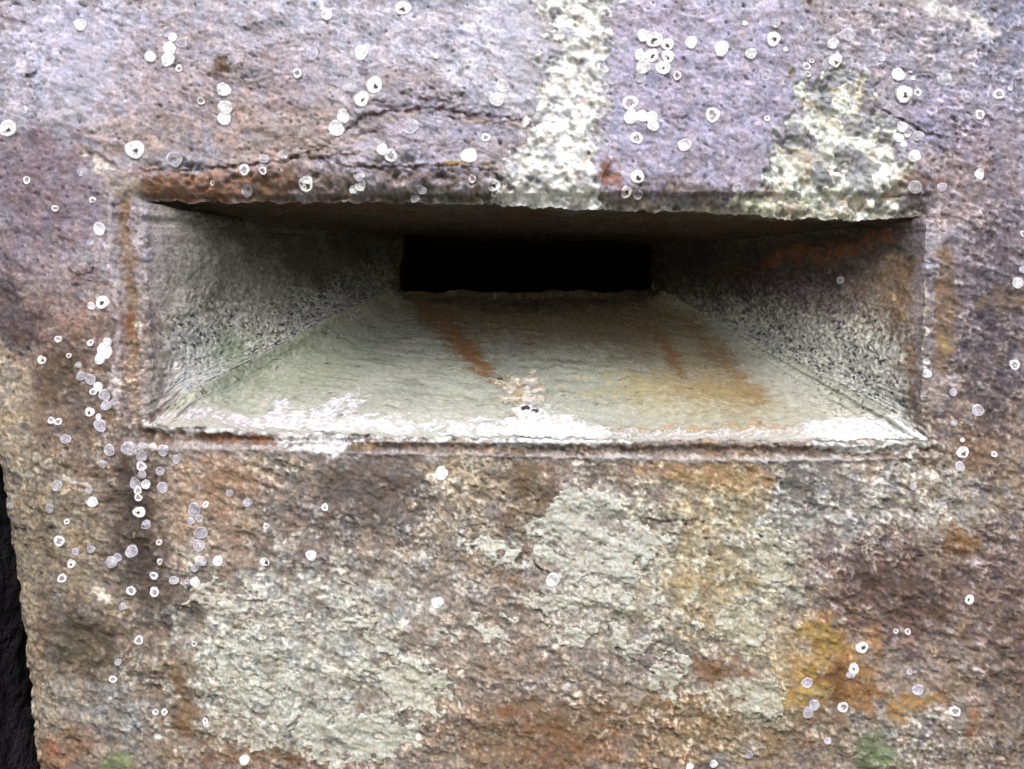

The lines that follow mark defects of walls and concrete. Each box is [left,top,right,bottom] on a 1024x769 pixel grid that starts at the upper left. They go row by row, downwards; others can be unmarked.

rust [121,164,335,212]
rust [410,291,493,382]
damp [142,359,927,518]
rust [781,623,963,724]